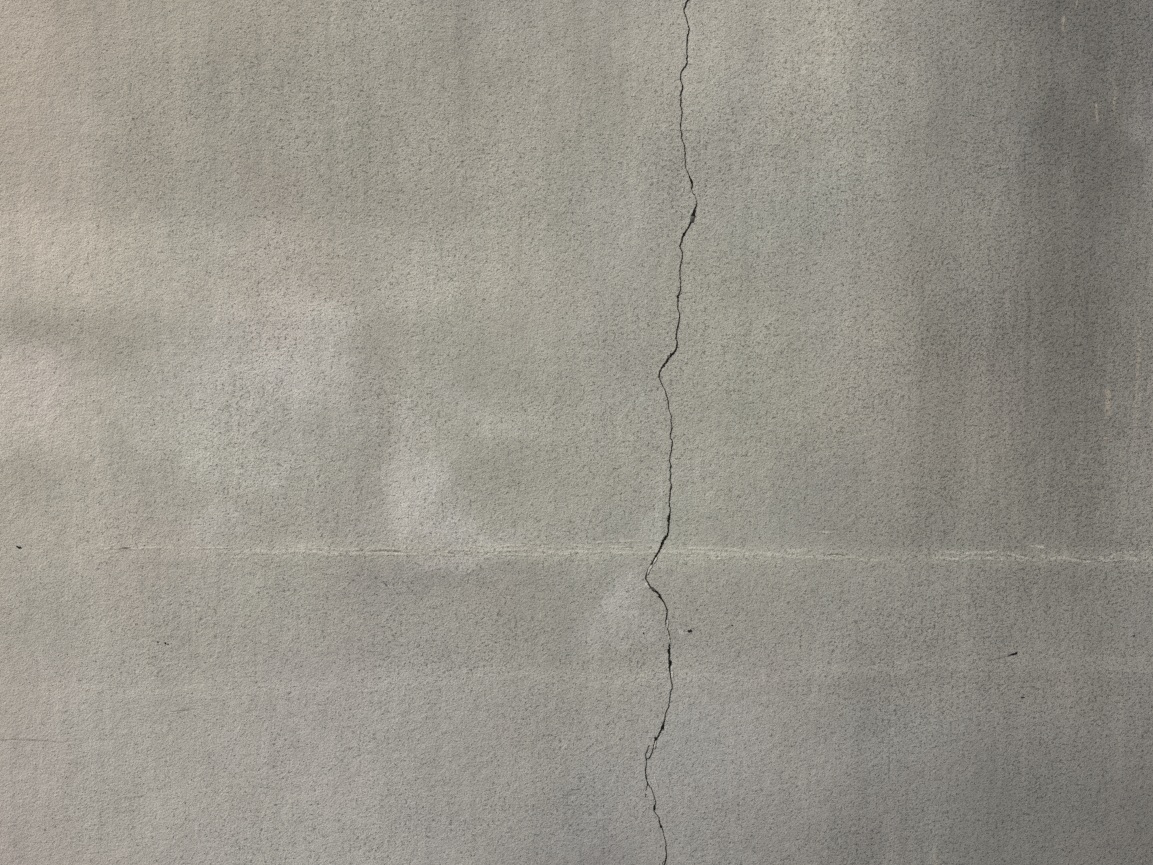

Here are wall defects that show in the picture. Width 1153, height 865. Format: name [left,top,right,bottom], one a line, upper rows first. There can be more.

crack [645,0,697,865]